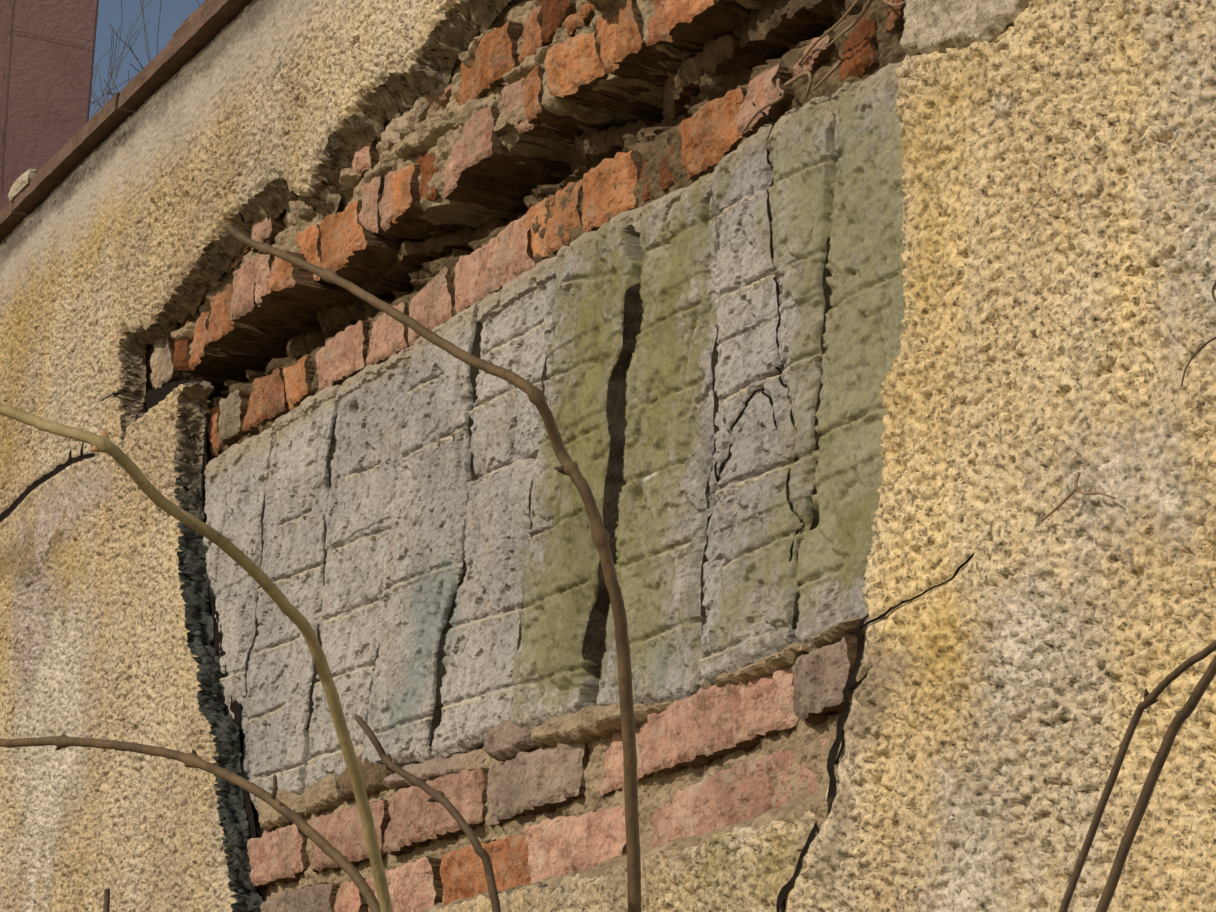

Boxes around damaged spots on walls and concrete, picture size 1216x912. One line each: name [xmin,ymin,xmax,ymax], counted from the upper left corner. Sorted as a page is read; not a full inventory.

crack [0,442,119,523]
crack [102,376,203,412]
crack [200,415,208,512]
flaking render [145,0,907,912]
crack [582,282,644,678]
crack [205,491,266,727]
crack [242,789,256,839]
crack [776,553,974,912]